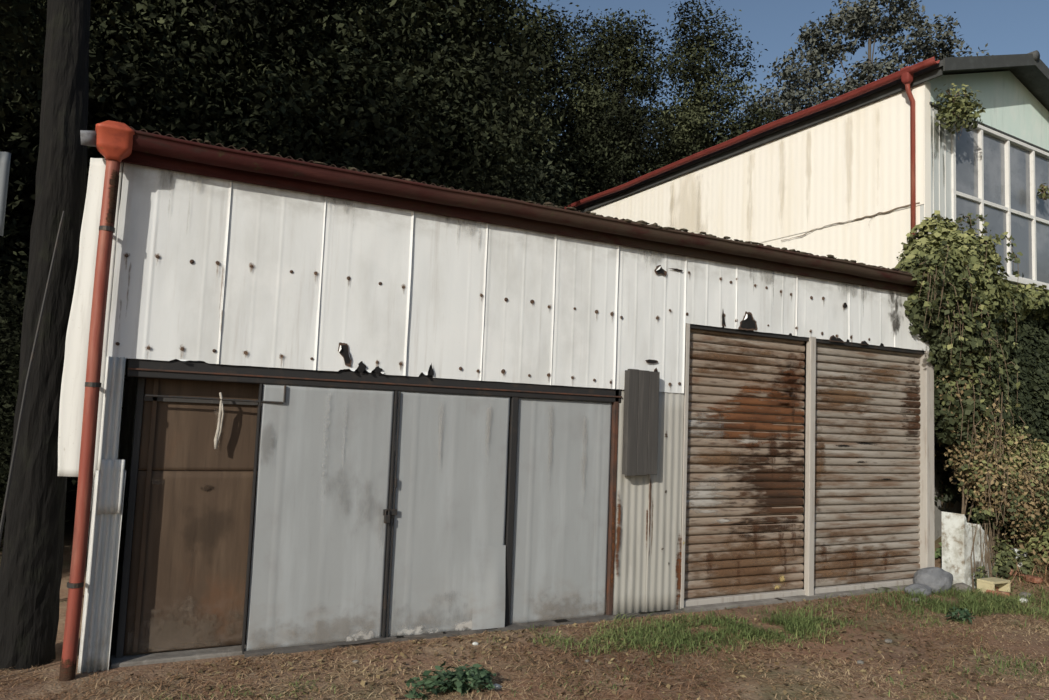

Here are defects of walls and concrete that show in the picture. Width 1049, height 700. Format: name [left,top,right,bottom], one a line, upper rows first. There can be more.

peeling [339,345,384,374]
corrosion [816,361,921,447]
corrosion [611,500,621,587]
corrosion [646,480,664,552]
corrosion [668,342,825,605]
corrosion [814,532,906,584]